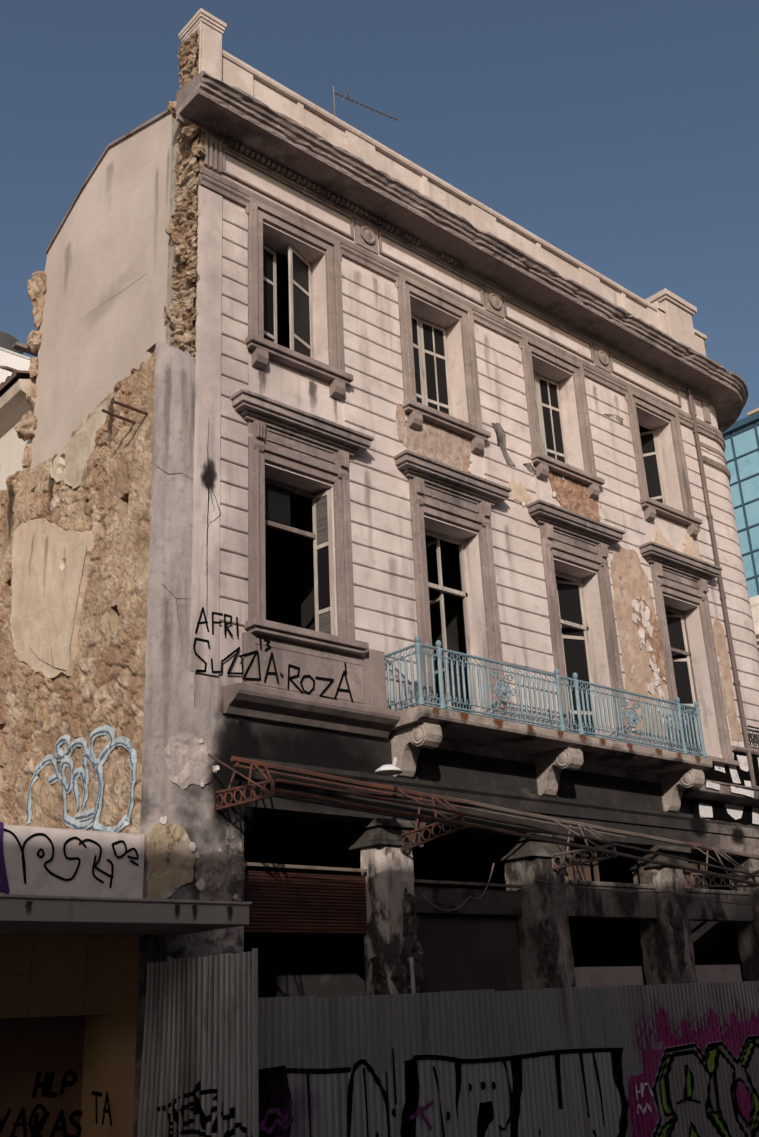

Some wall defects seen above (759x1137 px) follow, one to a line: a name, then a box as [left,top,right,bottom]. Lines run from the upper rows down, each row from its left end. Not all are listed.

flaking render [163,30,206,361]
spalling [14,271,47,472]
flaking render [395,401,471,472]
flaking render [492,420,605,522]
flaking render [609,547,672,736]
spalling [162,732,220,790]
spalling [145,816,245,902]